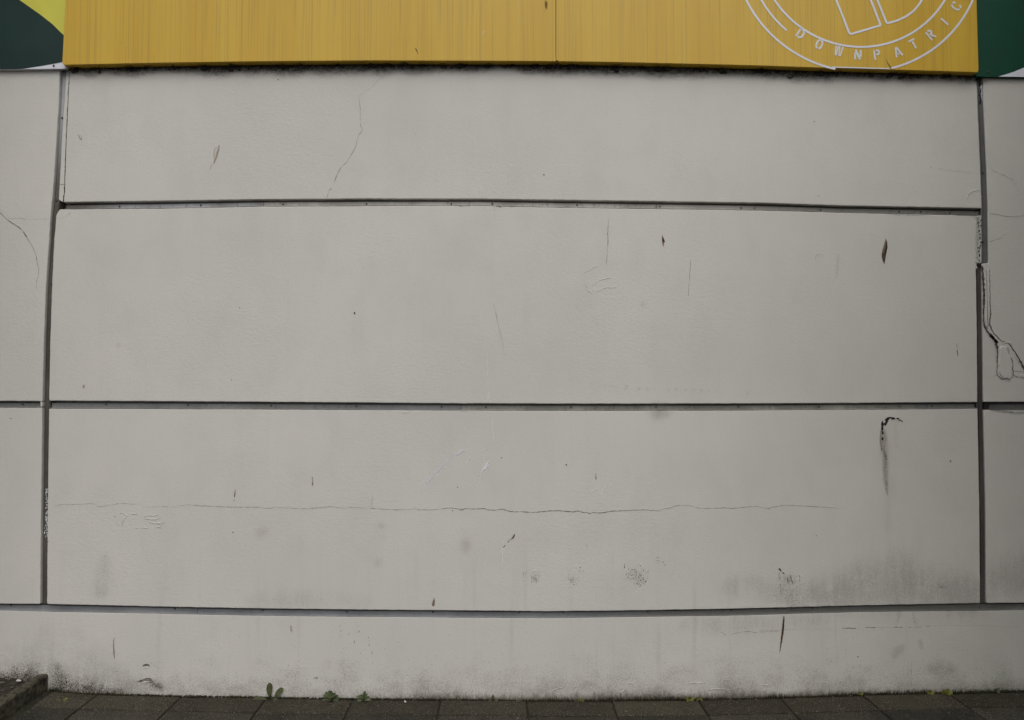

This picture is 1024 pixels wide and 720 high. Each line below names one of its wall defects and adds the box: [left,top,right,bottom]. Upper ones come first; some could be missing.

crack [981,266,1024,381]